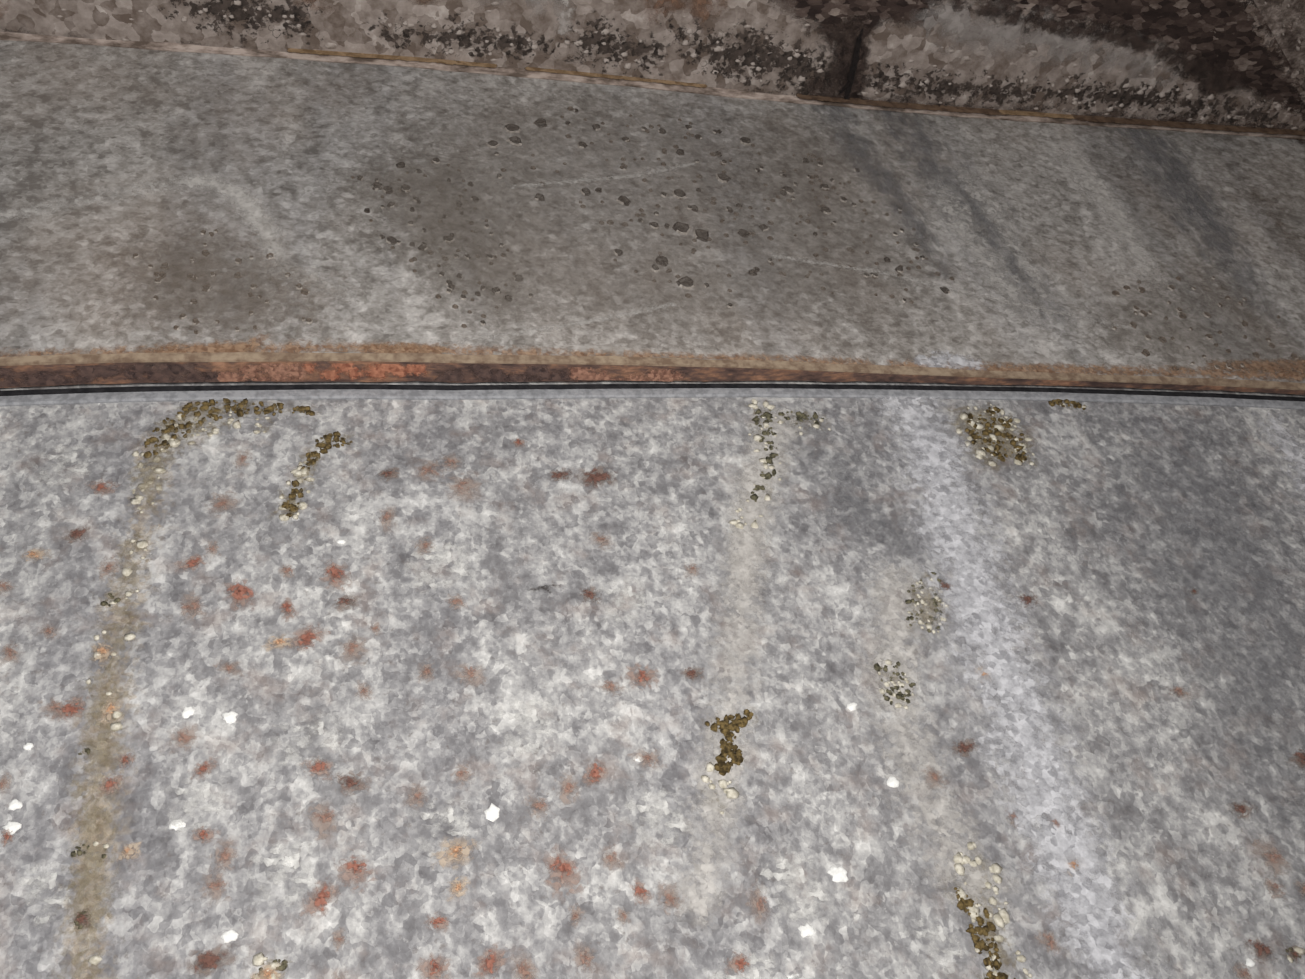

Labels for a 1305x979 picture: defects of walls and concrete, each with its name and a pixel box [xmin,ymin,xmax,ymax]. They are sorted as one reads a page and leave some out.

leakage [0,174,347,294]
corrosion [0,335,1305,387]
corrosion [552,467,612,486]
corrosion [321,562,356,610]
leakage [628,411,799,923]
leakage [868,396,1149,979]
corrosion [307,759,365,794]
leakage [174,783,223,828]
leakage [265,844,315,902]
corrosion [304,857,372,914]
corrosion [632,882,678,912]
corrosion [192,947,234,974]